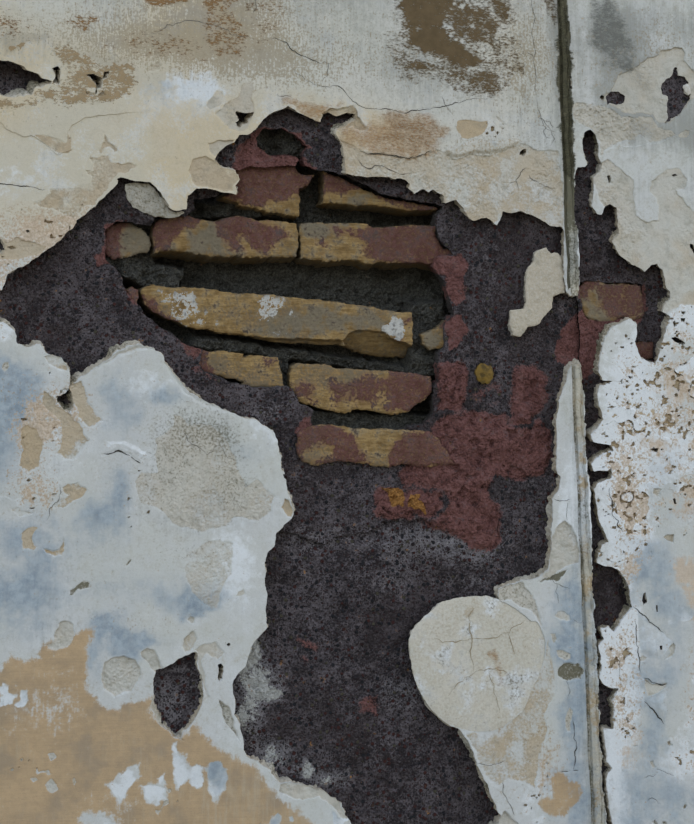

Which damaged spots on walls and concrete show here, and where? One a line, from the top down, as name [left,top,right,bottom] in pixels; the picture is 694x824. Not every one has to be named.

peeling [206,81,255,133]
flaking render [571,47,694,462]
flaking render [0,105,585,824]
crack [436,610,522,713]
flaking render [585,436,654,790]